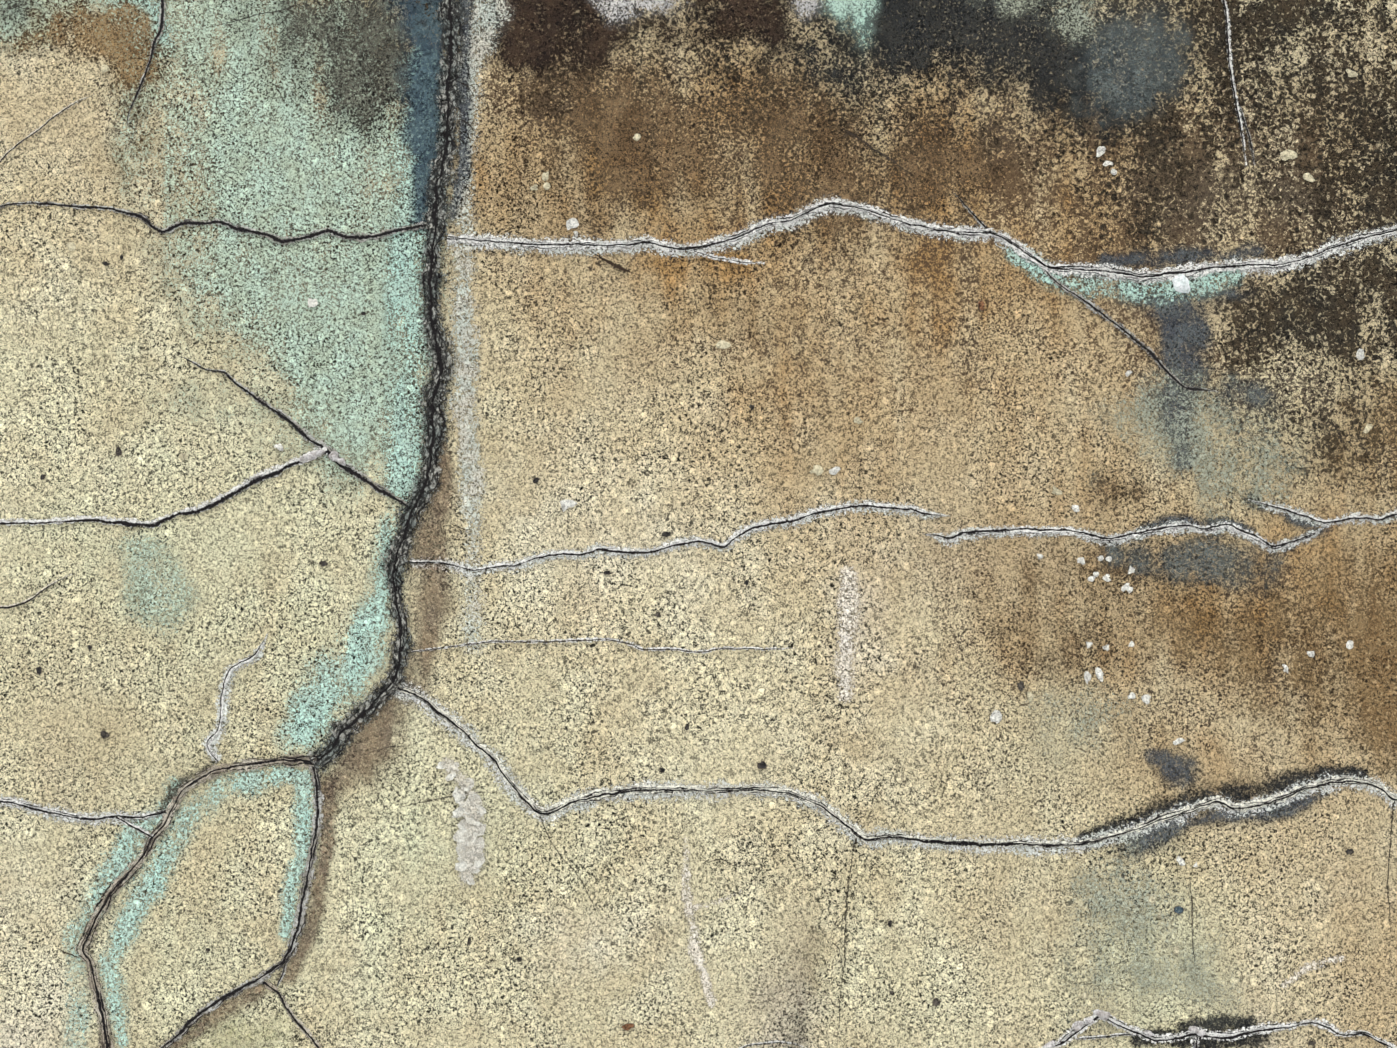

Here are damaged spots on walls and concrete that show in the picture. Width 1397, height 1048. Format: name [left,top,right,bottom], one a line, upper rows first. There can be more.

corrosion [466,15,1044,266]
crack [0,356,409,528]
leakage [276,511,407,751]
crack [75,0,948,1048]
leakage [0,0,1397,693]
corrosion [705,293,766,345]
crack [447,196,1397,392]
crack [923,499,1397,553]
corrosion [963,370,1397,778]
leakage [98,692,411,1048]
crack [395,681,1397,1032]
leakage [1072,745,1371,1048]